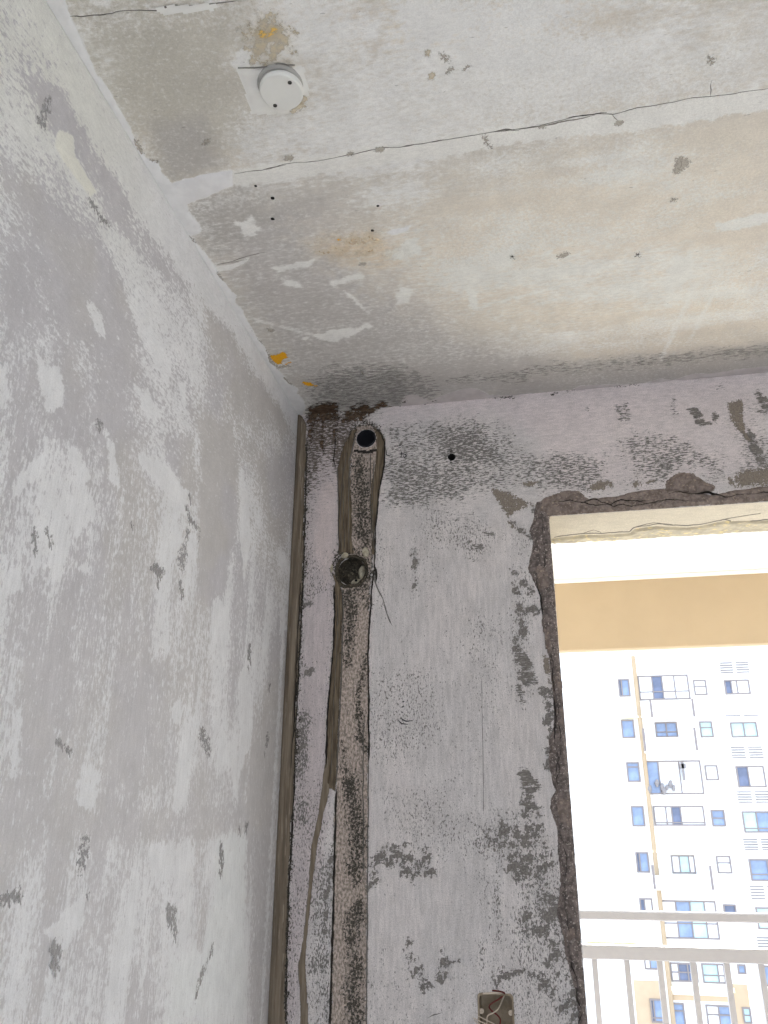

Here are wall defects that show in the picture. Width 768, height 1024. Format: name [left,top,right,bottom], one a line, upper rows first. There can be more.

crack [70,0,246,17]
rust [244,12,298,66]
crack [235,81,765,174]
water stain [305,401,392,455]